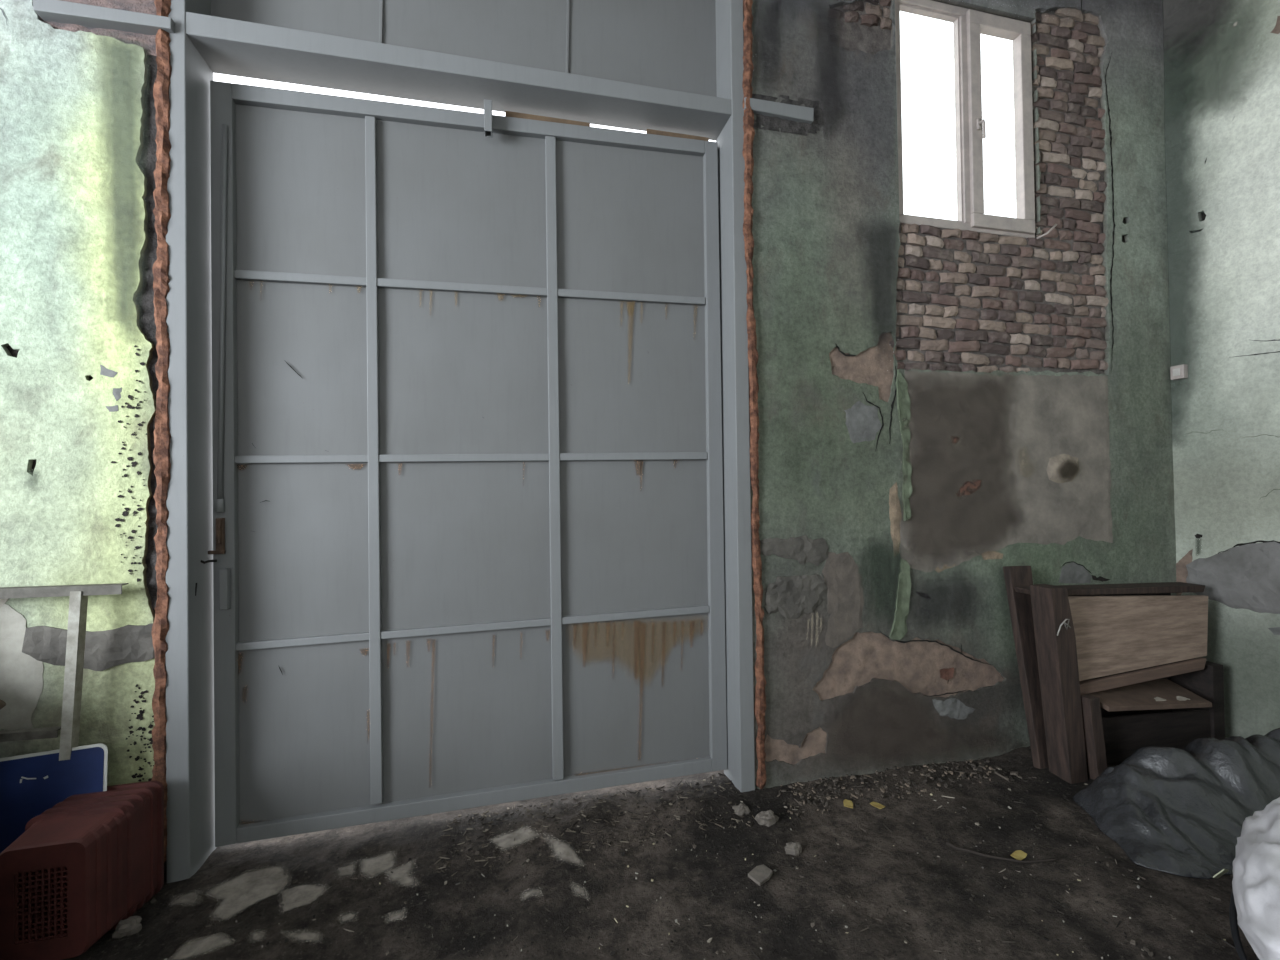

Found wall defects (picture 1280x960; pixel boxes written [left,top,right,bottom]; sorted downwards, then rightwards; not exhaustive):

flaking render [812,8,1109,720]
crack [1235,340,1280,357]
flaking render [1176,534,1202,595]
flaking render [764,727,827,765]